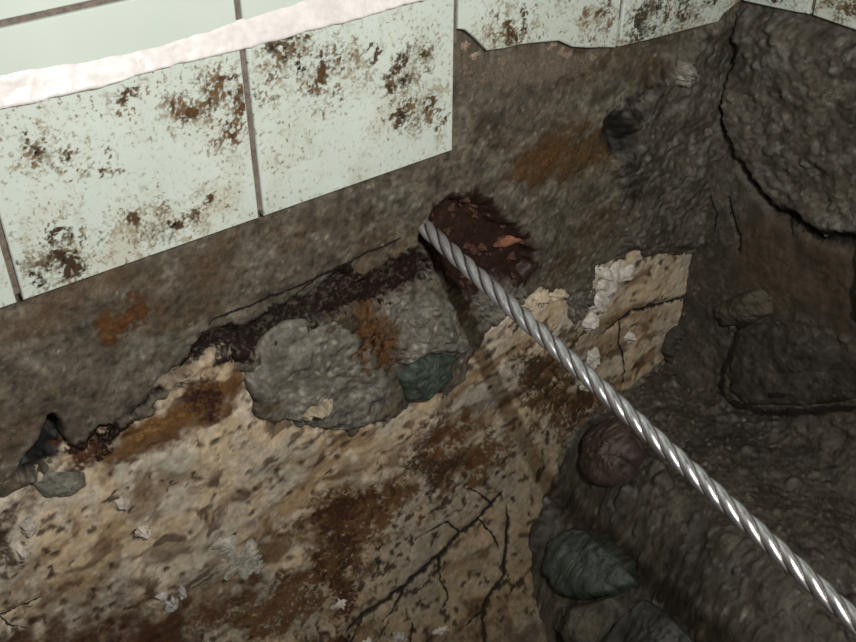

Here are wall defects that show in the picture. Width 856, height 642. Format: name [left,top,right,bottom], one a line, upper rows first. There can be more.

rust [159,66,248,147]
rust [259,34,450,139]
rust [16,218,86,290]
rust [112,194,214,243]
spalling [423,190,692,393]
efflorescence [582,259,637,333]
crack [750,172,856,322]
crack [57,237,432,462]
spalling [0,316,603,642]
damp [154,585,187,615]
damp [330,597,347,610]
crack [346,487,510,642]